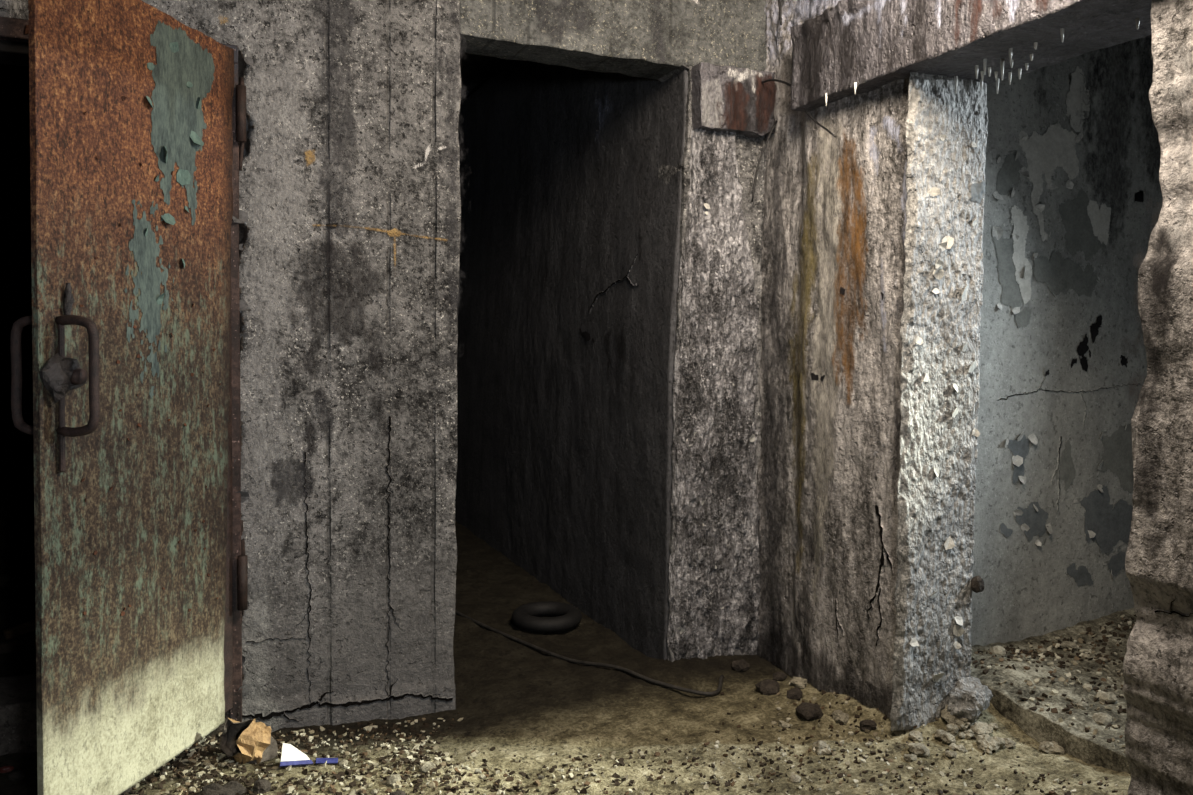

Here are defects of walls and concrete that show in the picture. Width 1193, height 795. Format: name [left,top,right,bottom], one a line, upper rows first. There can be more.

peeling [162,206,189,225]
peeling [164,146,191,185]
corrosion [719,75,776,131]
corrosion [833,142,866,398]
crack [242,416,453,722]
crack [835,505,894,647]
spalling [890,66,1111,731]
crack [998,367,1143,512]
peeling [1056,423,1134,581]